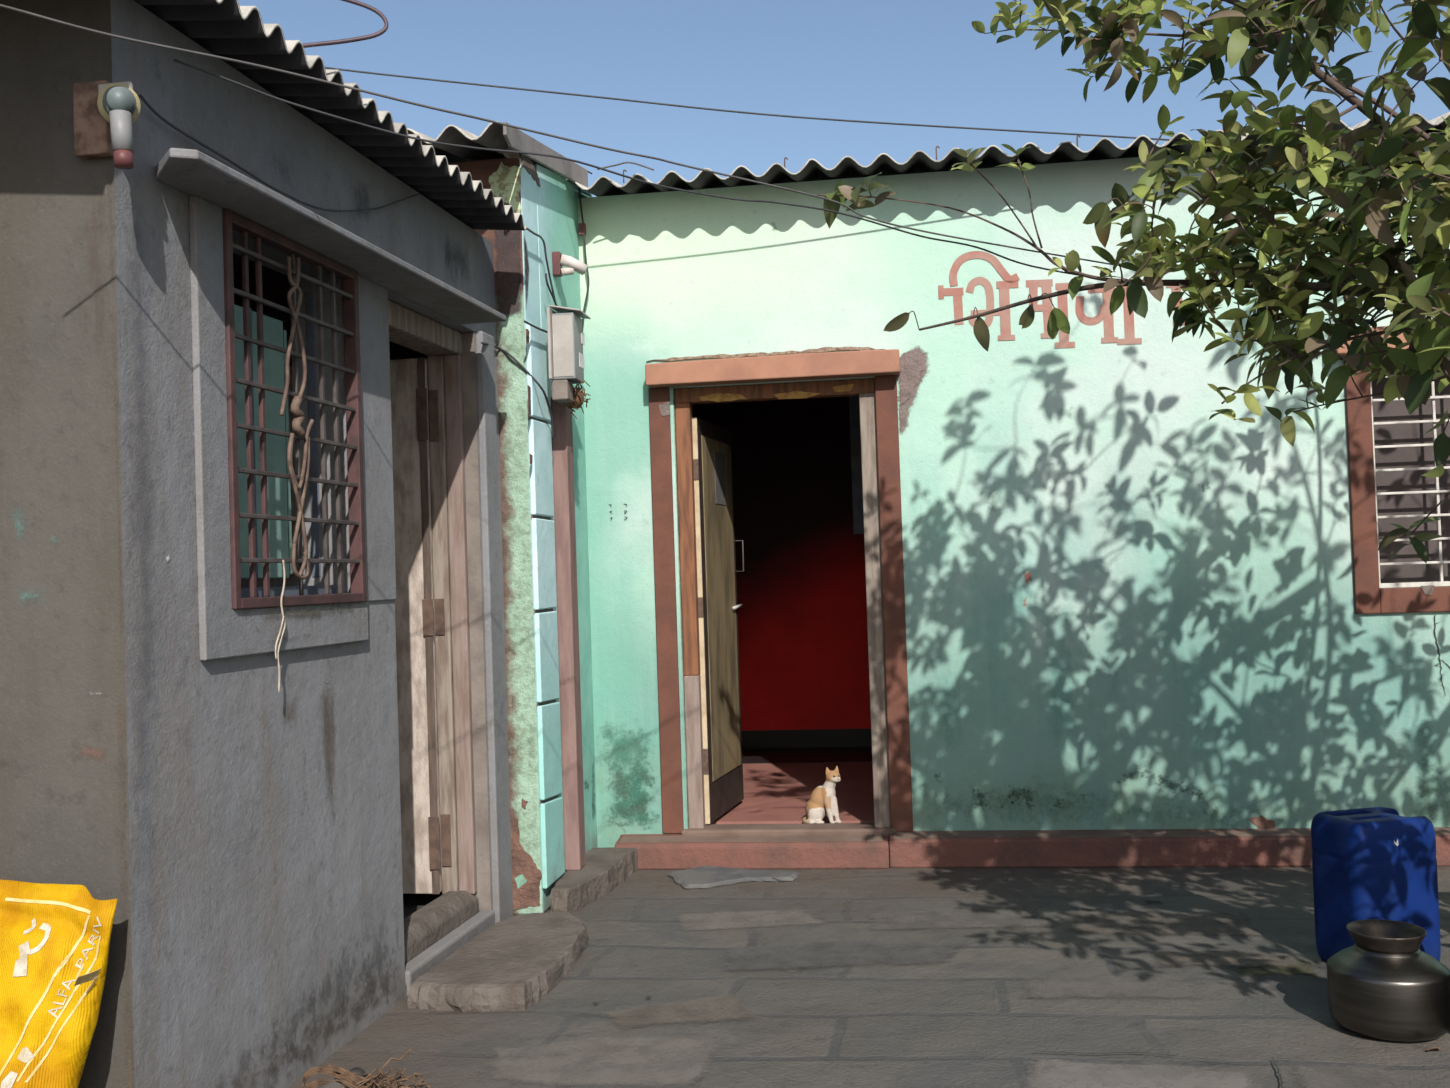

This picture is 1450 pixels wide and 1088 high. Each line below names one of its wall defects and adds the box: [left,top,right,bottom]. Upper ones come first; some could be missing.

leakage [495,230,529,316]
flaking render [646,347,924,430]
crack [1434,616,1450,697]
peeling [510,798,542,910]